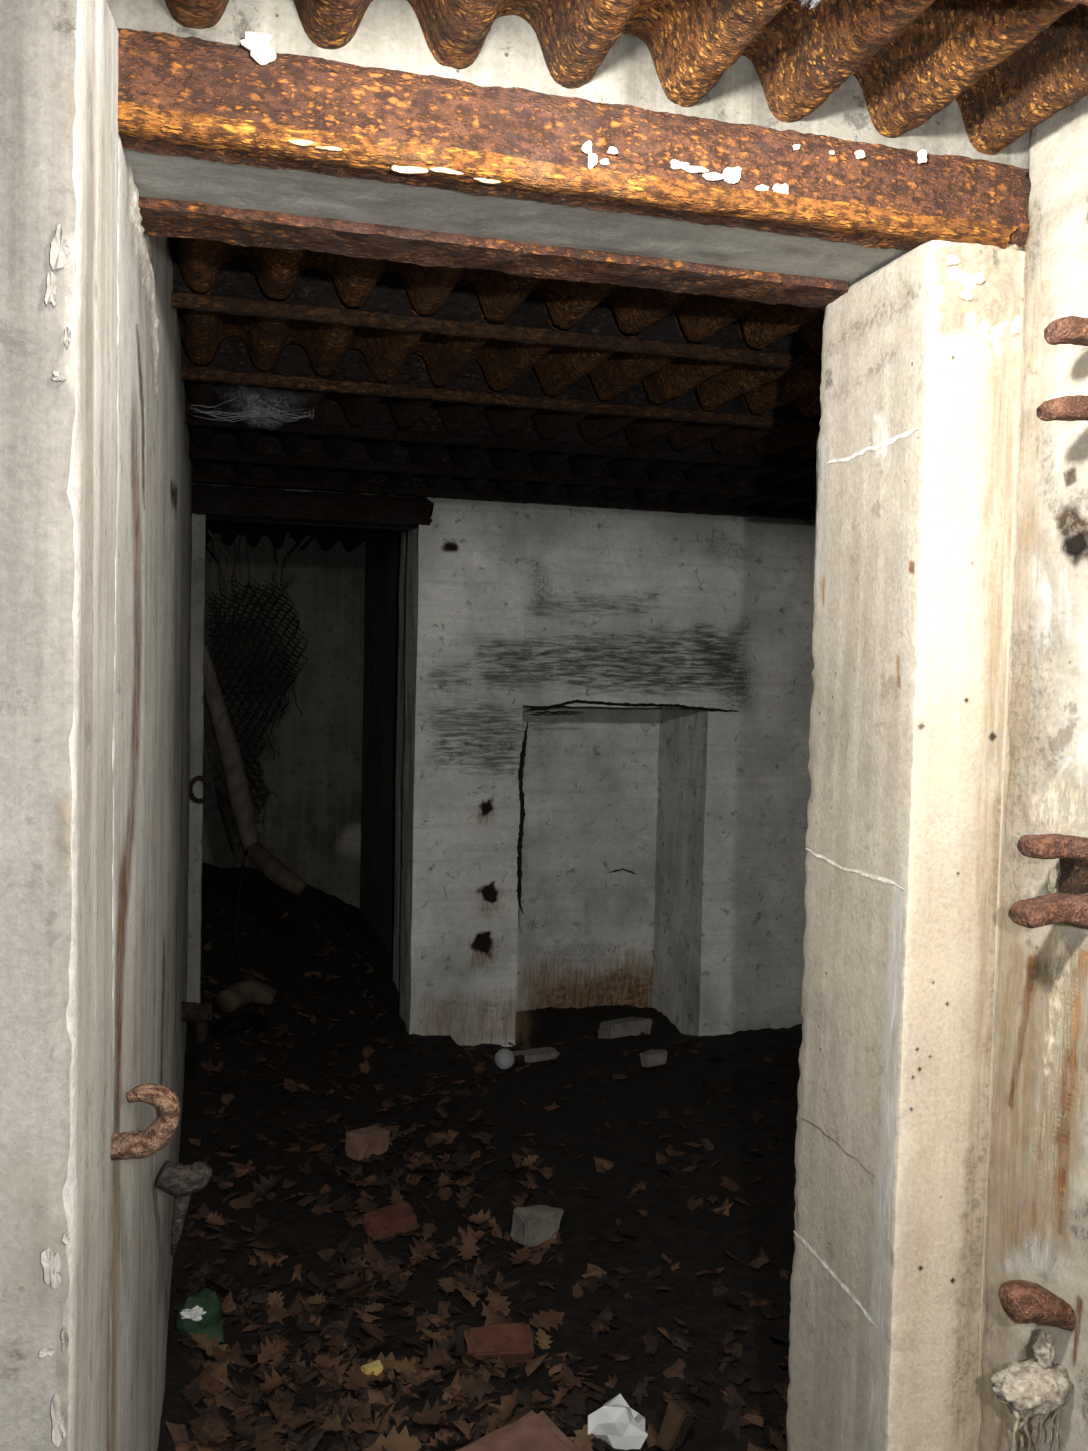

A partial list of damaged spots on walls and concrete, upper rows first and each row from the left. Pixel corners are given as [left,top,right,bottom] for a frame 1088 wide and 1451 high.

crack [517,700,739,914]
corrosion [992,930,1088,1272]